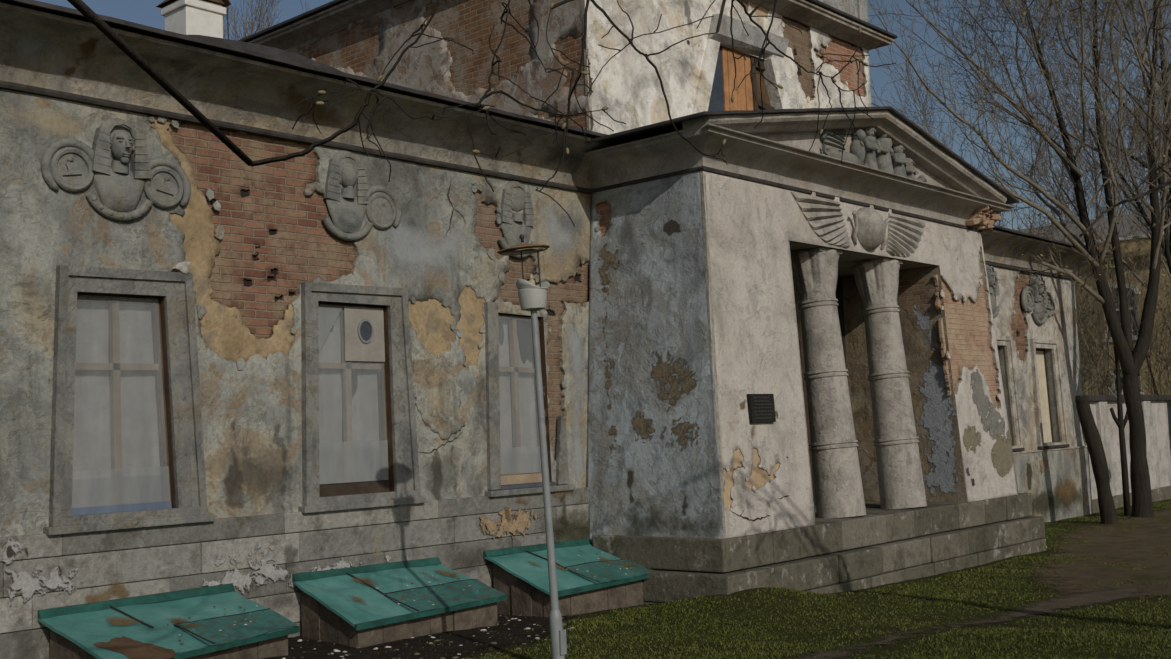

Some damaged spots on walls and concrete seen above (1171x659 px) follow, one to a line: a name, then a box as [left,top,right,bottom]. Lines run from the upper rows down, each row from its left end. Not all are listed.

flaking render [302,22,380,75]
flaking render [394,0,534,96]
flaking render [554,34,593,97]
flaking render [781,16,864,102]
flaking render [535,108,594,131]
flaking render [148,116,356,370]
flaking render [663,220,680,235]
flaking render [408,185,620,460]
flaking render [630,347,701,452]
flaking render [898,260,1014,477]
flaking render [719,448,788,511]
flaking render [480,508,543,539]